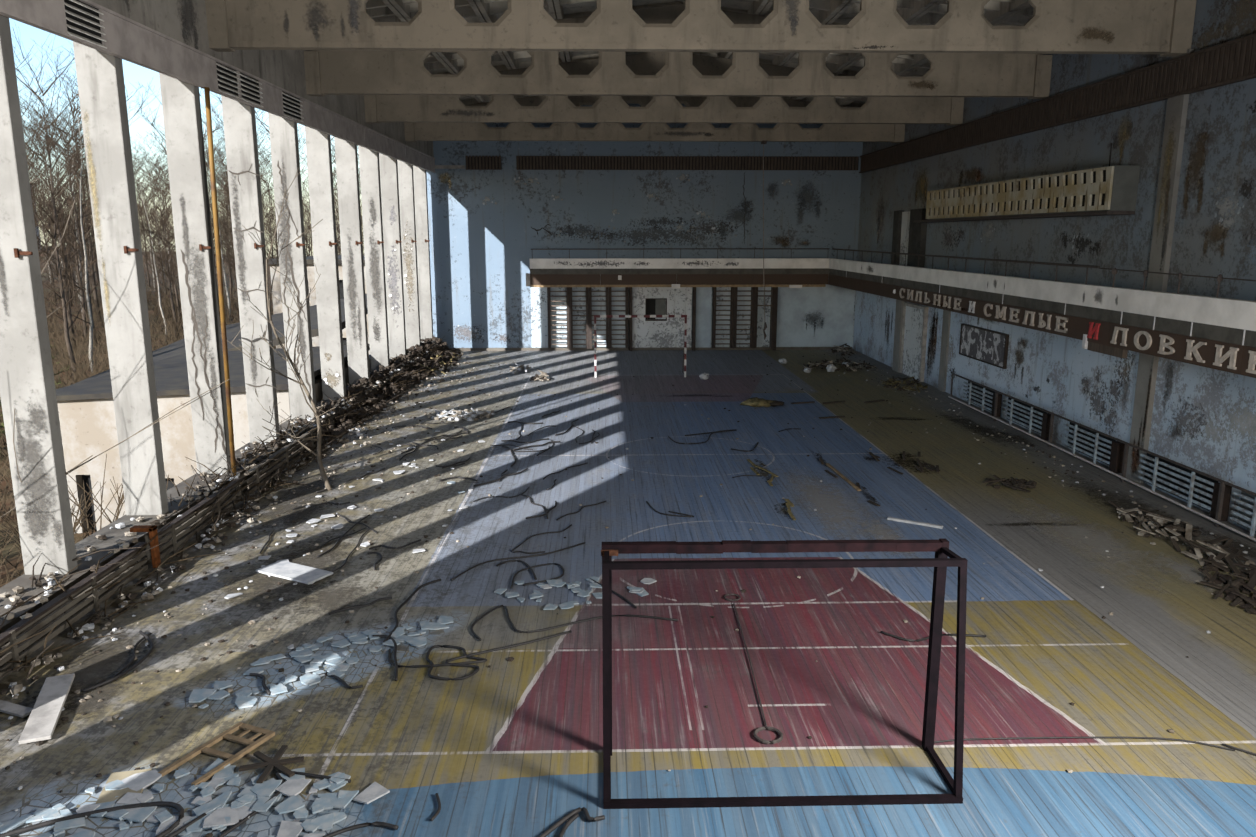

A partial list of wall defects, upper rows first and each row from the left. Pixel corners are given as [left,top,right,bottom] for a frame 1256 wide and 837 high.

damp [1157,124,1209,264]
spalling [1081,350,1136,434]